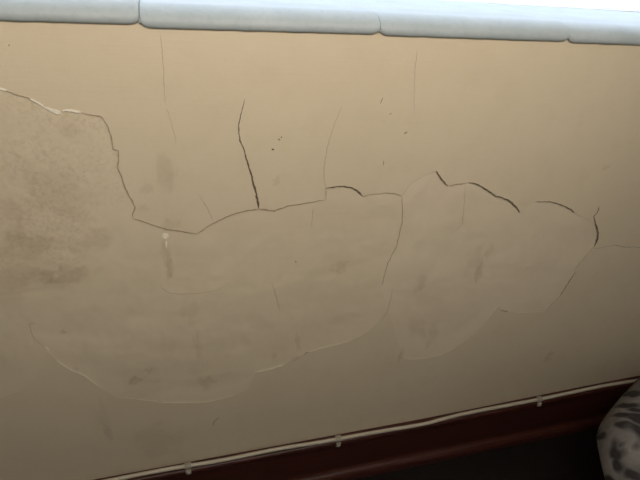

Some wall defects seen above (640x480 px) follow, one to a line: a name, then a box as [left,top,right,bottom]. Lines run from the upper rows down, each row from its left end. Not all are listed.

crack [84,103,519,319]
crack [551,208,640,305]